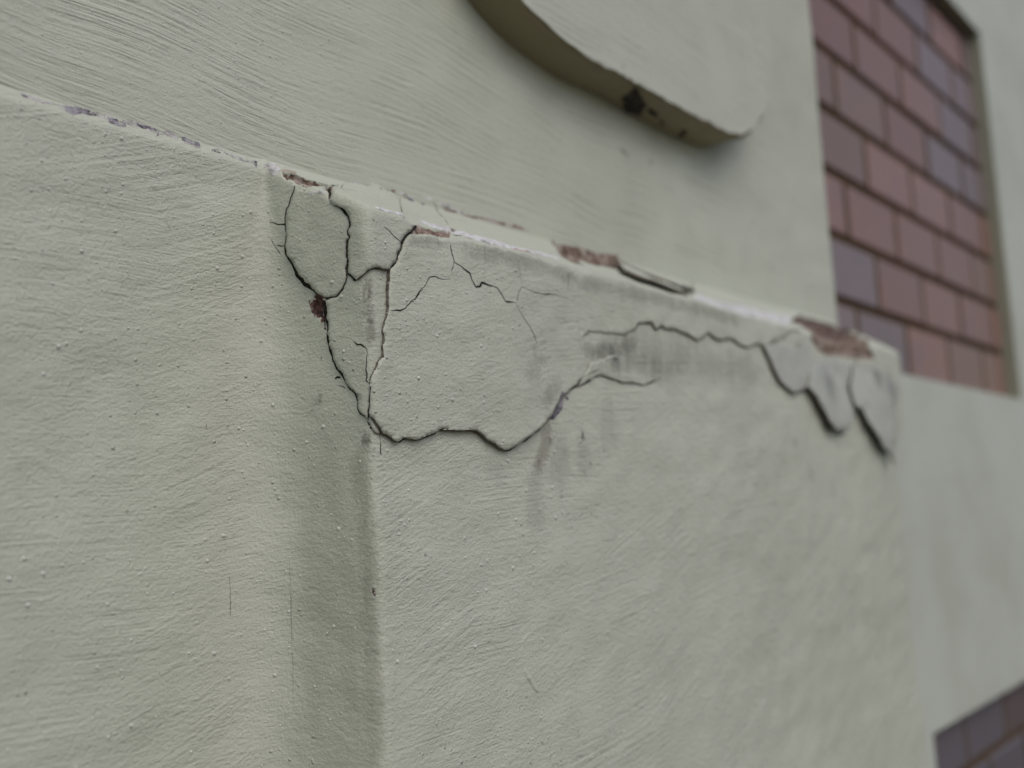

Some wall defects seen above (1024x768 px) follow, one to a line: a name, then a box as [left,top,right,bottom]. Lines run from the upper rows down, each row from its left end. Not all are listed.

spalling [621,87,664,125]
crack [270,186,467,454]
crack [349,203,569,356]
flaking render [21,93,898,464]
crack [565,369,660,395]
crack [796,388,877,437]